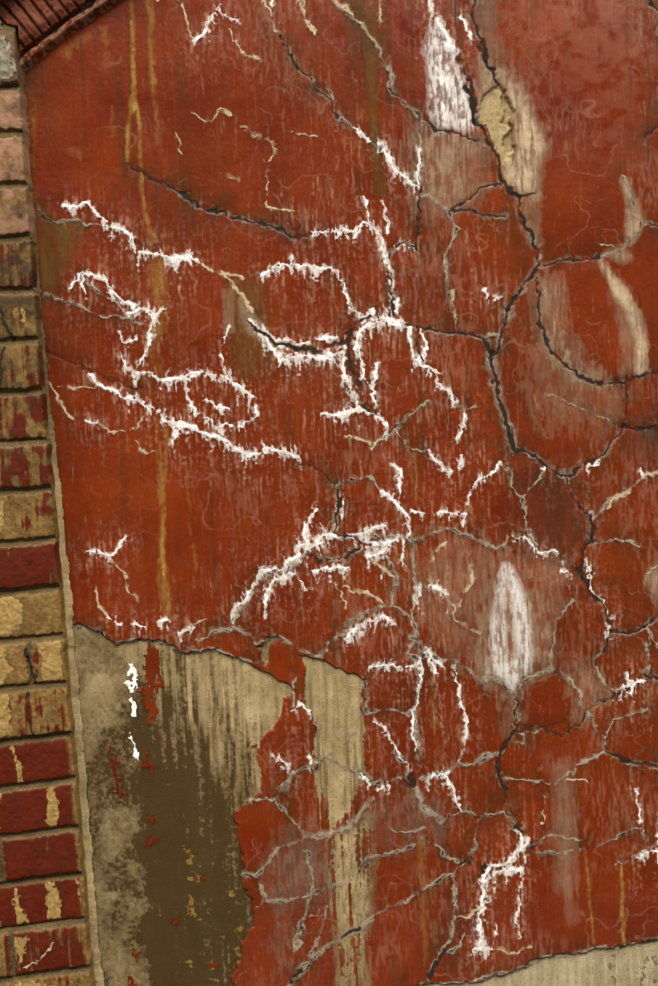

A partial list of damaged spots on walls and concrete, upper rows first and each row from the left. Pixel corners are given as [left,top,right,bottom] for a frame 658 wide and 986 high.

damp [428,0,471,133]
spalling [475,85,514,163]
damp [37,201,254,313]
crack [130,165,367,243]
crack [49,382,154,454]
damp [44,271,301,461]
damp [348,464,425,577]
crack [173,0,658,986]
peeling [0,596,24,783]
crack [72,623,164,644]
peeling [72,623,375,986]
peeling [414,940,658,986]